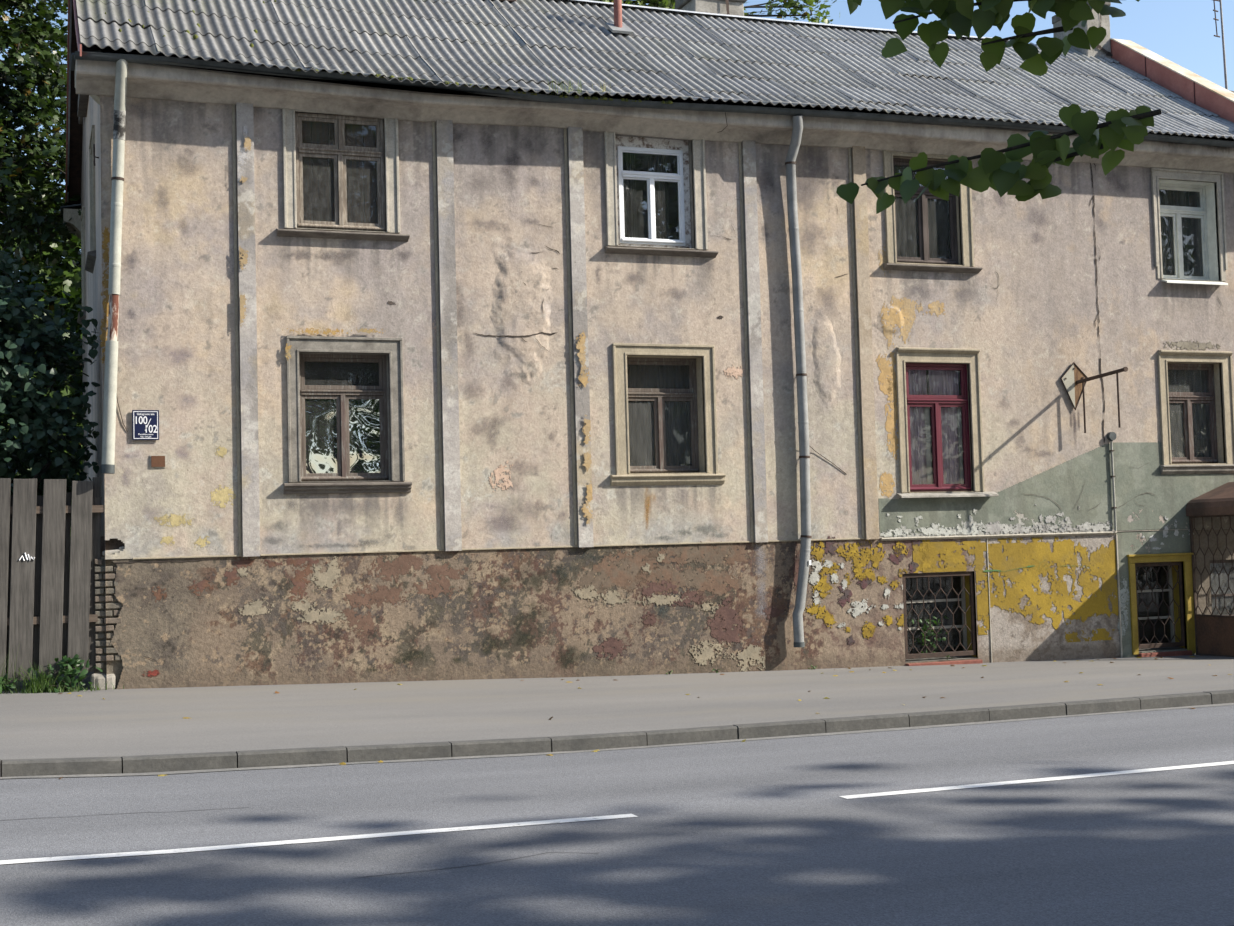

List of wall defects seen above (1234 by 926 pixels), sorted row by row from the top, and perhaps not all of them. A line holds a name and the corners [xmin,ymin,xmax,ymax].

crack [475,224,560,356]
peeling [878,247,887,276]
peeling [576,333,589,387]
peeling [876,295,946,460]
peeling [210,485,236,508]
peeling [581,415,593,524]
peeling [879,472,897,497]
flaking render [94,513,210,690]
peeling [189,552,469,641]
peeling [792,504,1114,647]